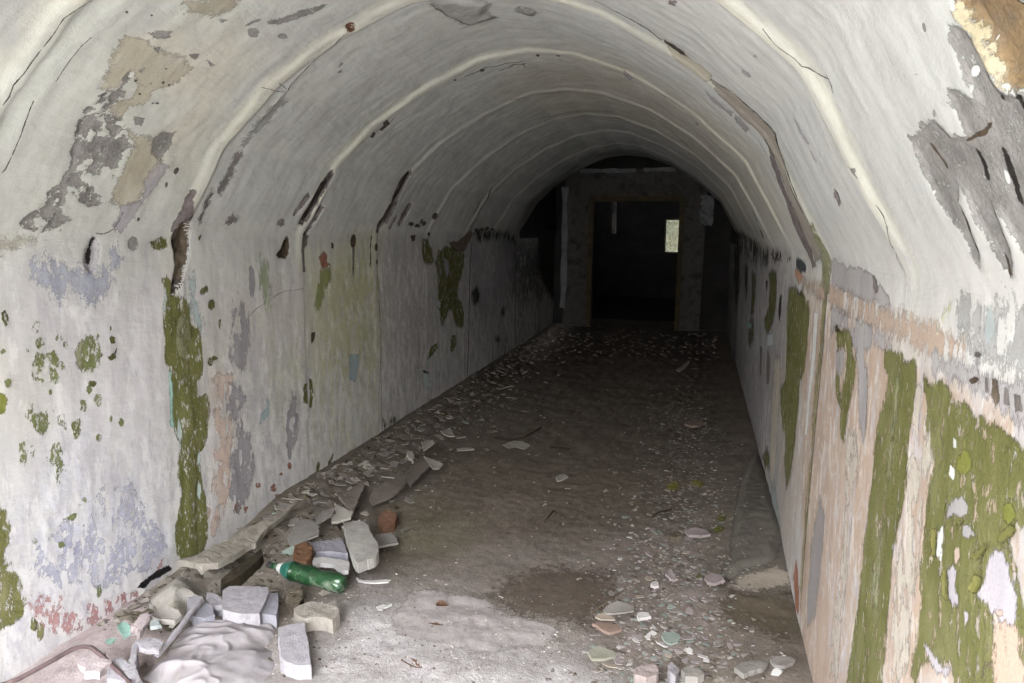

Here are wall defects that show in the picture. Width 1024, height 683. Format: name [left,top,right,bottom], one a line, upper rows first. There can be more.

crack [2,1,91,173]
spalling [19,67,145,233]
peeling [30,131,179,308]
spalling [148,30,172,52]
spalling [170,99,287,298]
spalling [276,170,334,272]
spalling [376,169,438,242]
crack [595,1,833,294]
spalling [907,0,1024,431]